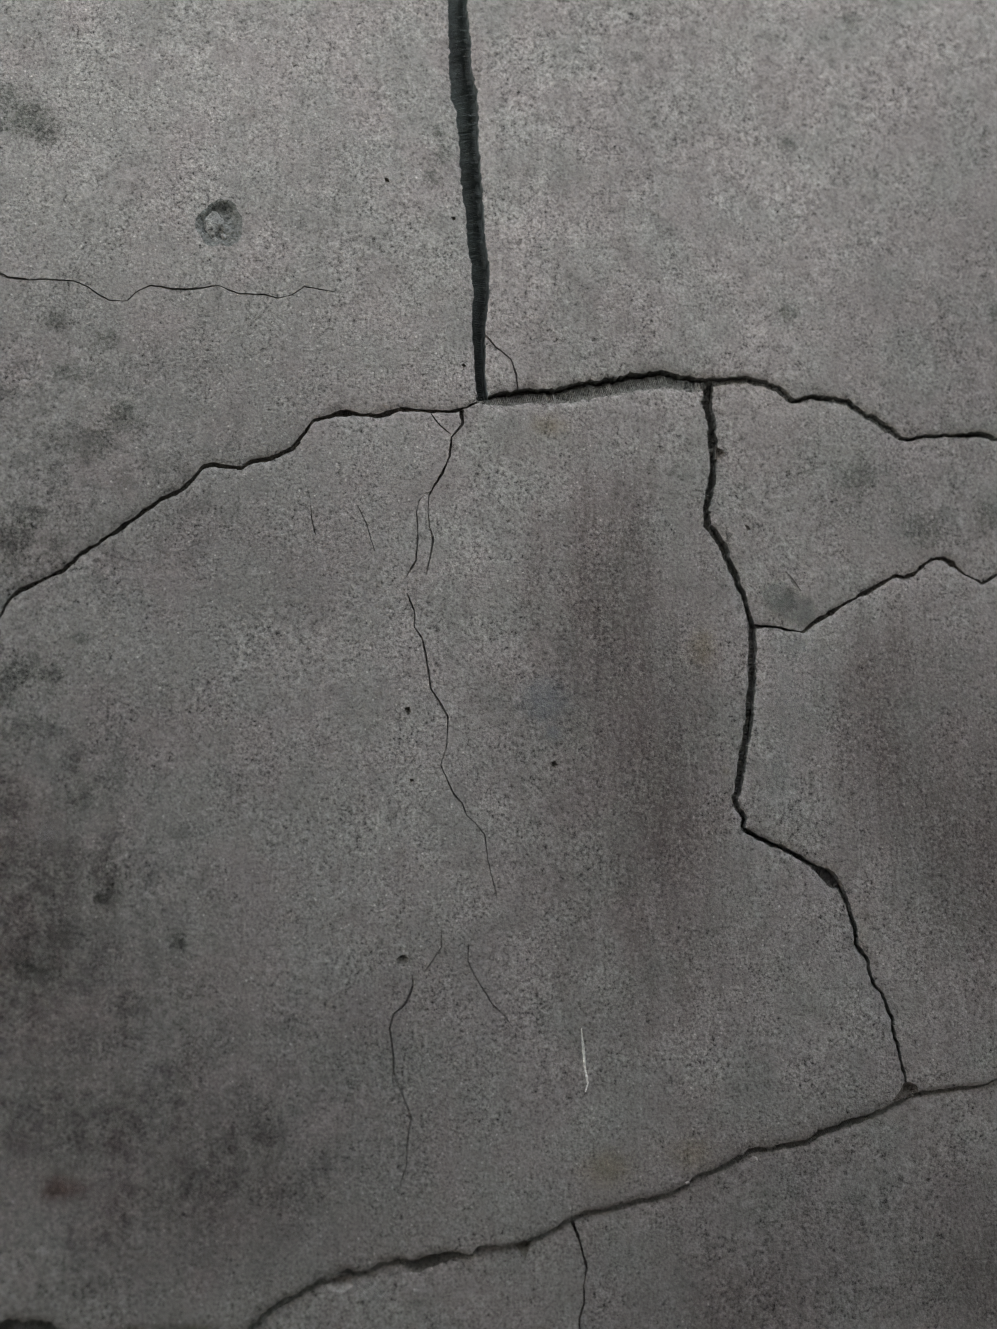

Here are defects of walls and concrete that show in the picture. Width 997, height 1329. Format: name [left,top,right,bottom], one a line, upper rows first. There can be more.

crack [0,273,335,301]
crack [0,402,479,618]
crack [447,0,997,1083]
crack [407,593,498,900]
crack [389,932,514,1192]
crack [0,1319,57,1329]
crack [247,1079,997,1329]